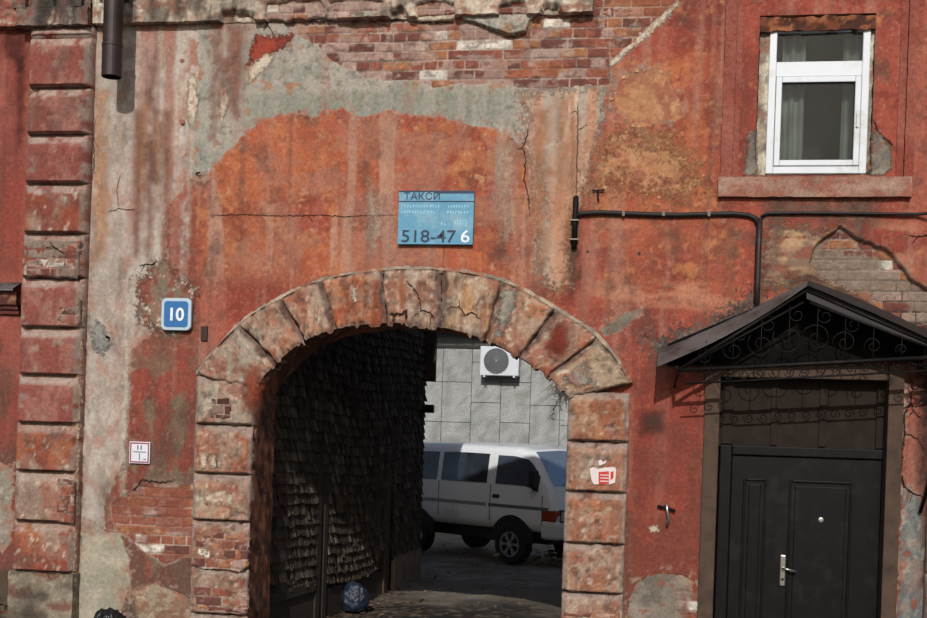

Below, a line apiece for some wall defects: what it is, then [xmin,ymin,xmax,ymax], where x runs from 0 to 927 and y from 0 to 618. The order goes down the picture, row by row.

crack [517,125,530,216]
peeling [867,130,893,177]
peeling [24,0,721,618]
crack [387,281,480,323]
flaking render [626,215,927,361]
peeling [0,462,15,552]
peeling [897,485,927,618]